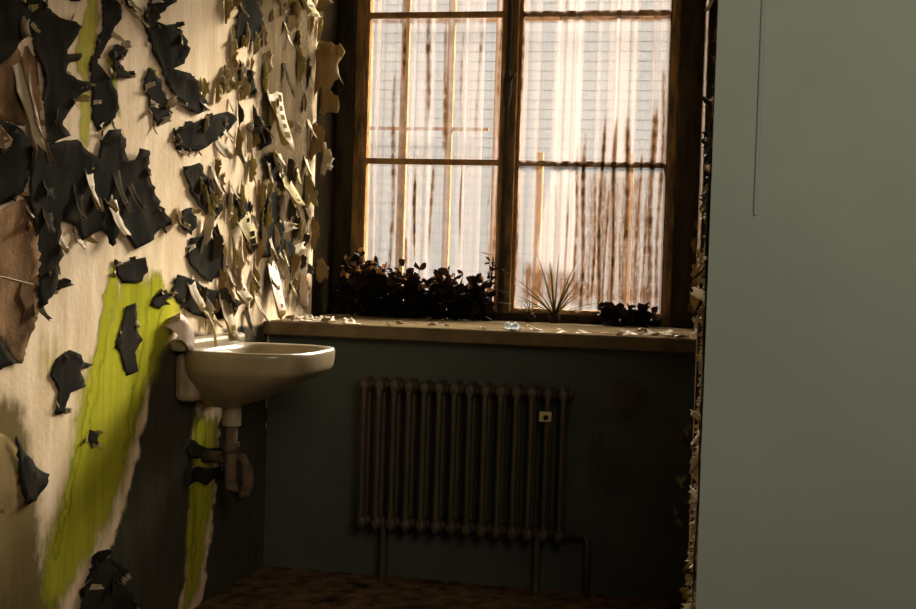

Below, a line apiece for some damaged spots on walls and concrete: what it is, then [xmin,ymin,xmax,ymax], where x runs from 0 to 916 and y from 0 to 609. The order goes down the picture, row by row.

flaking render [50,350,94,415]
peeling [0,0,346,376]
peeling [508,84,715,609]
peeling [79,549,144,609]